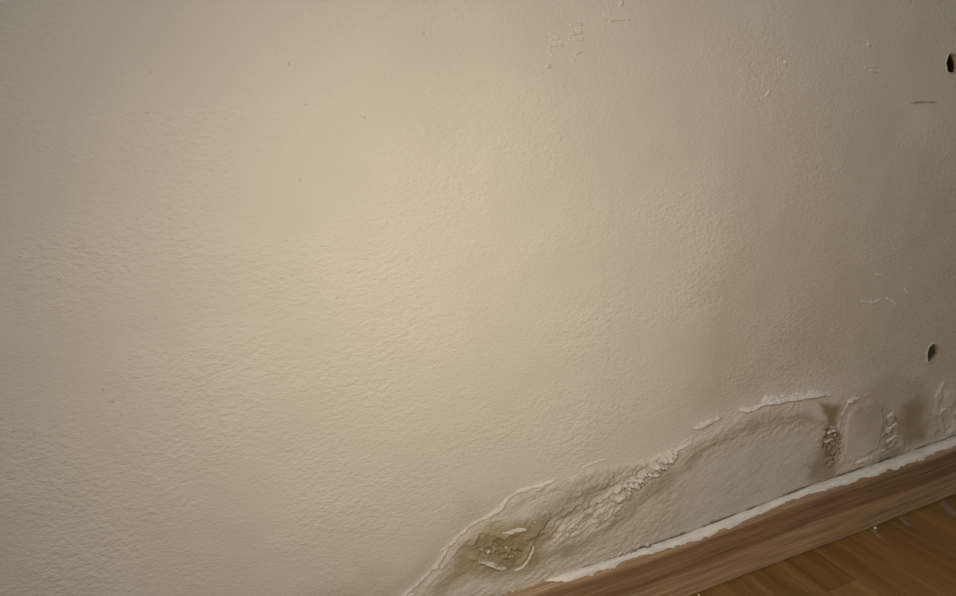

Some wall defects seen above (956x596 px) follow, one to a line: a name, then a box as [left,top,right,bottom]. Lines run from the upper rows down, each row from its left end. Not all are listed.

water stain [425,469,680,596]
flaking render [400,389,847,596]
flaking render [879,404,905,461]